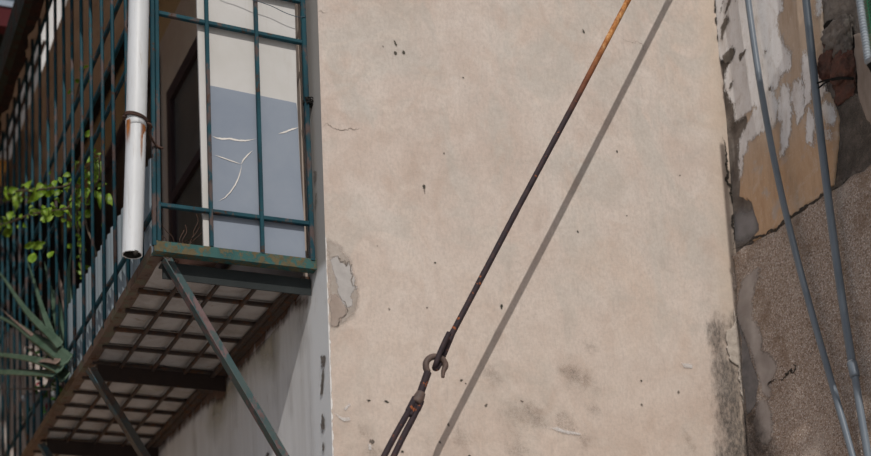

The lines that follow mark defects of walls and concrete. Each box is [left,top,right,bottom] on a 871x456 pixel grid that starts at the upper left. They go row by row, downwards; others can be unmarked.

peeling [715,0,871,180]
spalling [327,241,358,327]
spalling [725,311,745,411]
water stain [712,325,771,456]